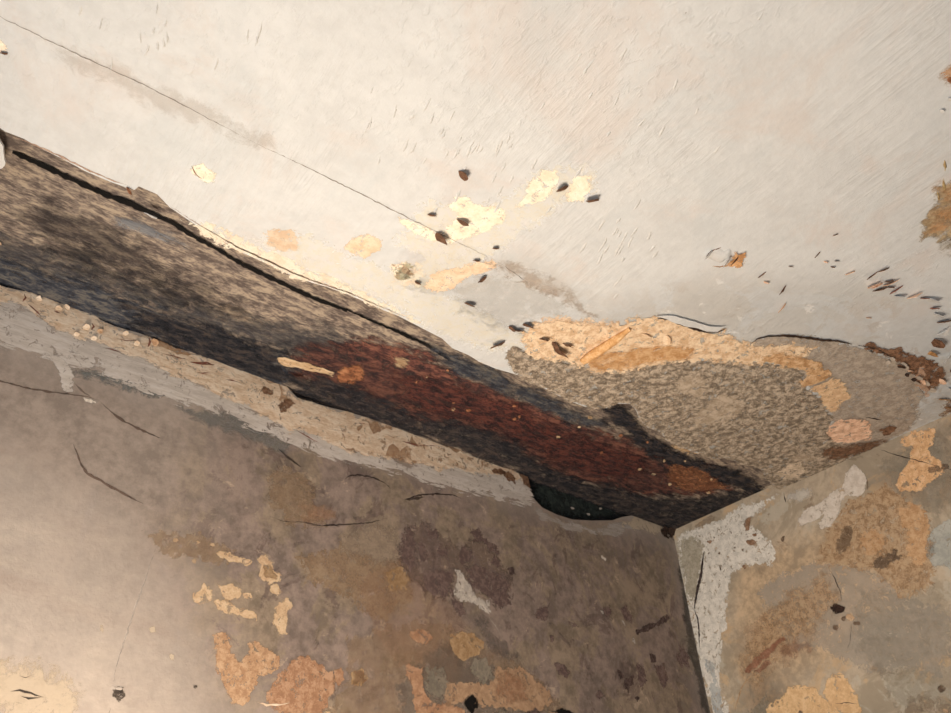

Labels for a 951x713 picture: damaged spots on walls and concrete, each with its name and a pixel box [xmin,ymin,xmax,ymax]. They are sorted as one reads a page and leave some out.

leakage [920,160,951,248]
spalling [0,128,951,540]
crack [0,380,159,438]
crack [73,444,139,502]
peeling [193,541,293,635]
peeling [395,527,570,713]
peeling [677,494,779,713]
peeling [926,519,951,570]
peeling [212,632,368,713]
peeling [766,672,862,713]